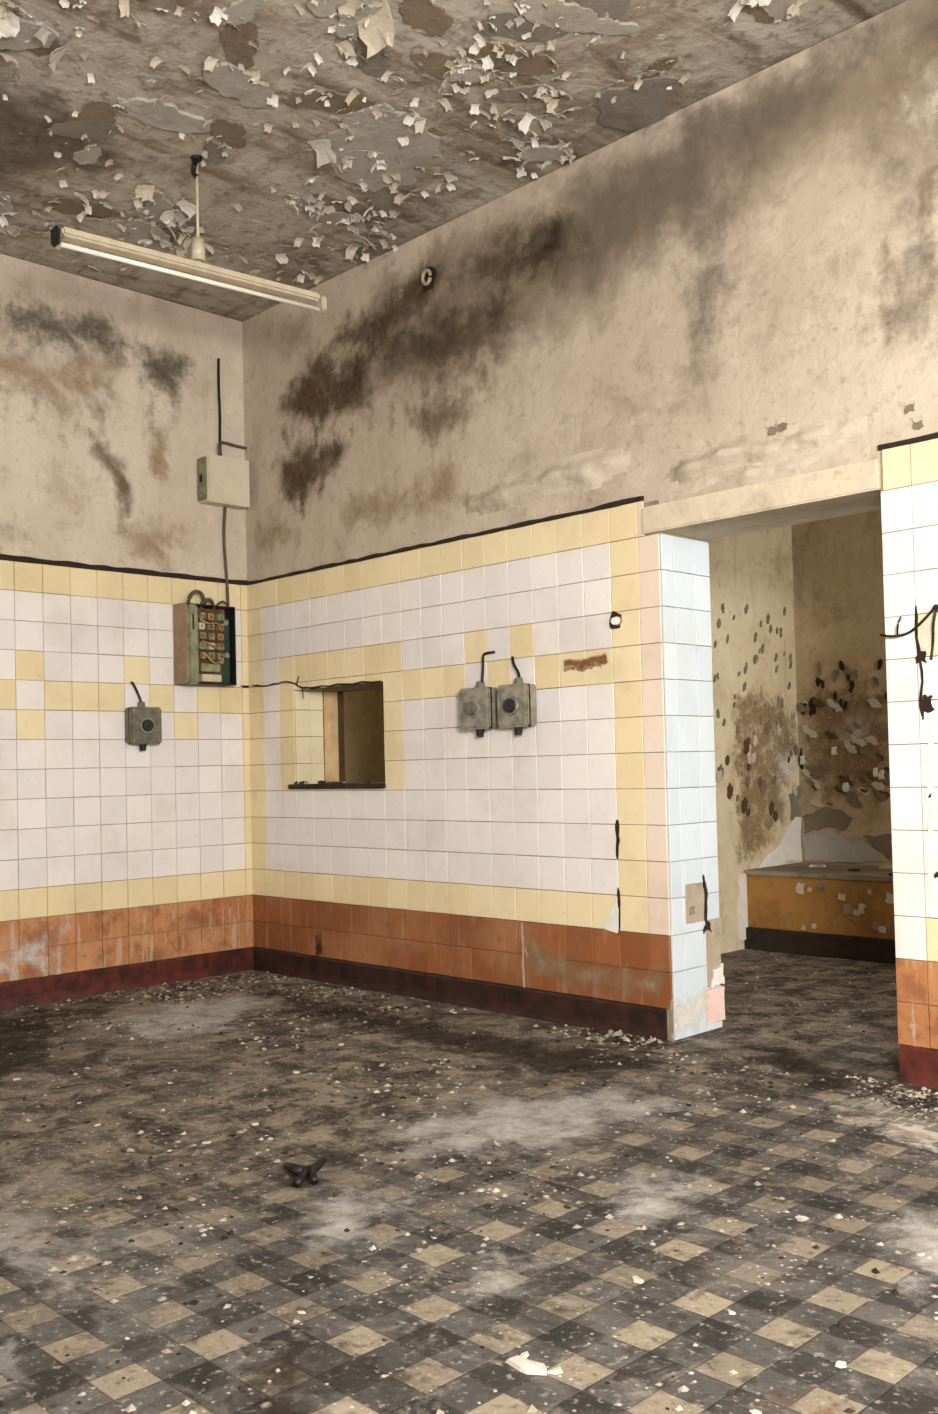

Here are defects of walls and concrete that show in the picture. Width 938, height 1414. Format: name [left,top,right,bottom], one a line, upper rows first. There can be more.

peeling [0,0,691,285]
peeling [722,0,809,27]